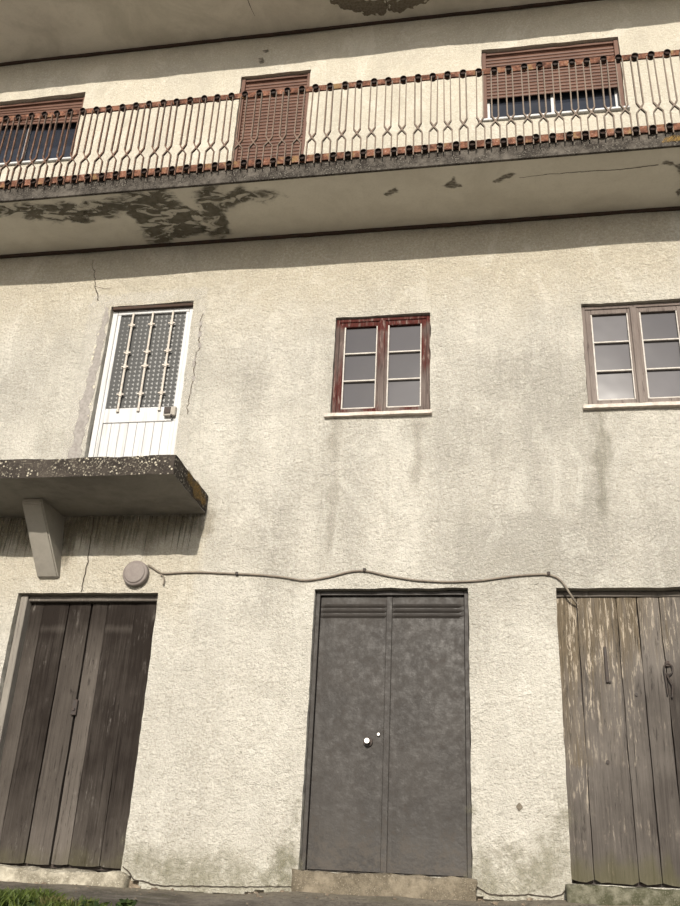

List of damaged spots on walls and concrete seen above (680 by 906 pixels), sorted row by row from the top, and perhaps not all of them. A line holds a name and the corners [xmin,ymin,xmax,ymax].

peeling [330,0,429,16]
crack [186,314,203,414]
damp [0,517,30,549]
damp [63,514,201,561]